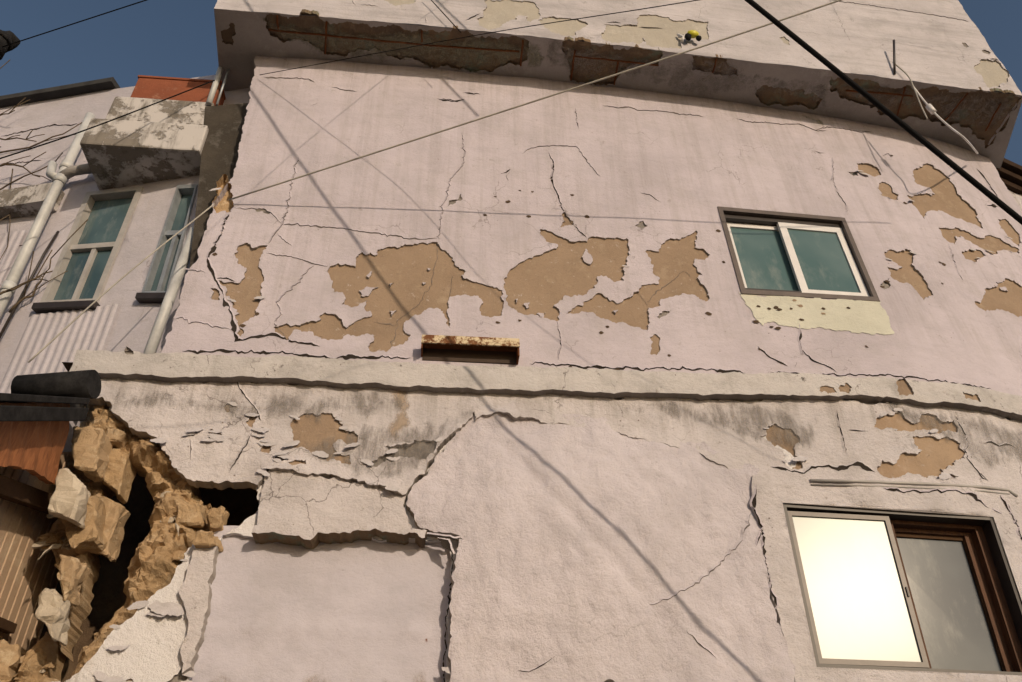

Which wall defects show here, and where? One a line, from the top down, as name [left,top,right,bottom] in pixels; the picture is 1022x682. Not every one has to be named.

spalling [264,0,709,85]
crack [437,92,480,102]
spalling [755,50,1021,148]
peeling [211,243,267,336]
crack [173,132,467,360]
peeling [274,212,712,357]
crack [500,108,601,237]
peeling [849,163,1022,262]
crack [530,321,745,373]
crack [770,324,992,389]
peeling [874,408,965,478]
crack [649,410,1022,609]